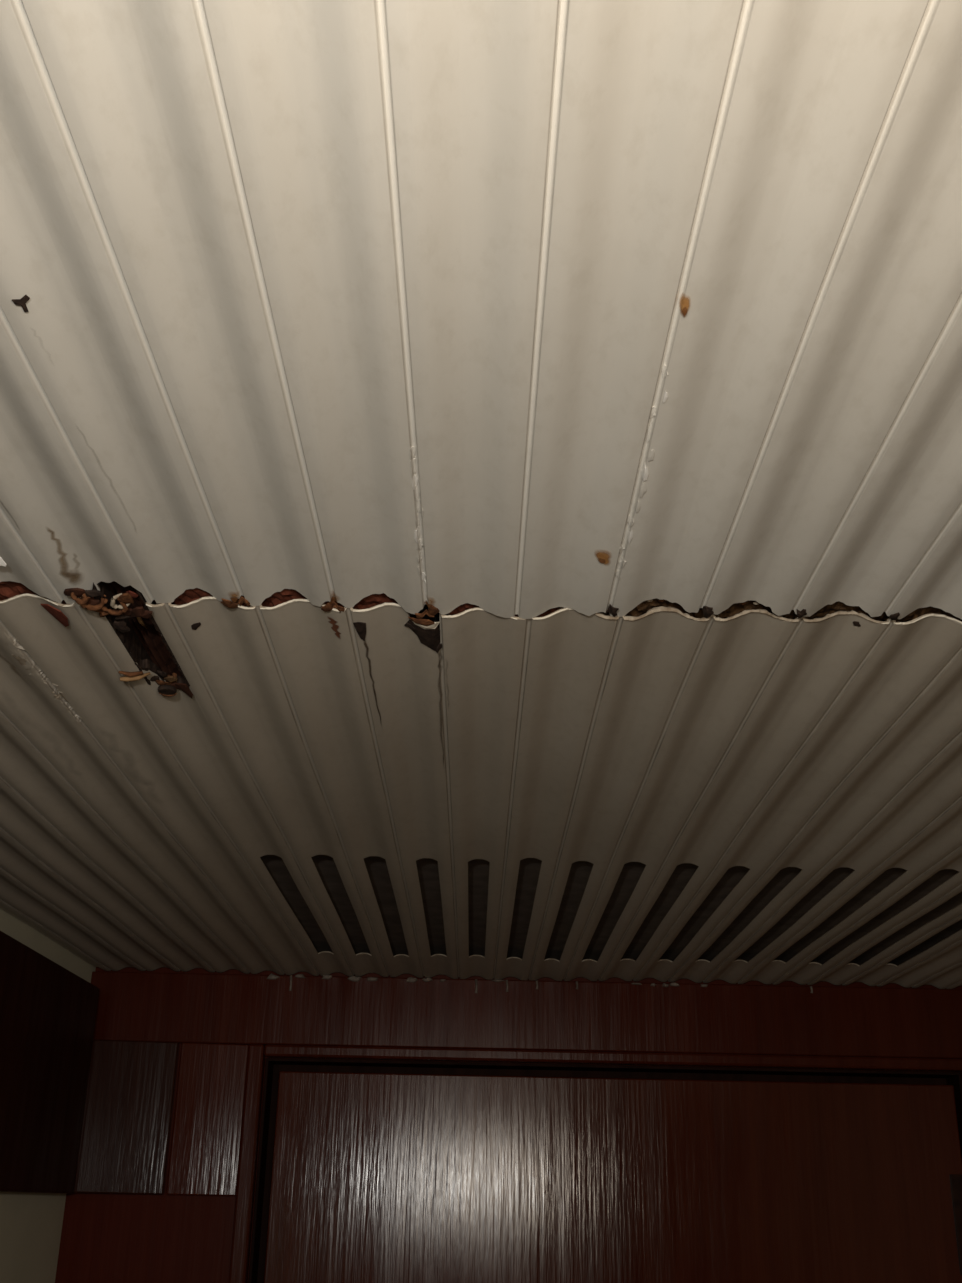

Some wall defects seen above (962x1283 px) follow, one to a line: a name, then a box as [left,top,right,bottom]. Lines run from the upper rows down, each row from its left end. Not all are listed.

spalling [12,295,30,312]
corrosion [680,296,689,317]
corrosion [596,552,610,564]
crack [0,581,94,627]
peeling [64,588,132,616]
crack [126,588,962,626]
peeling [404,604,447,653]